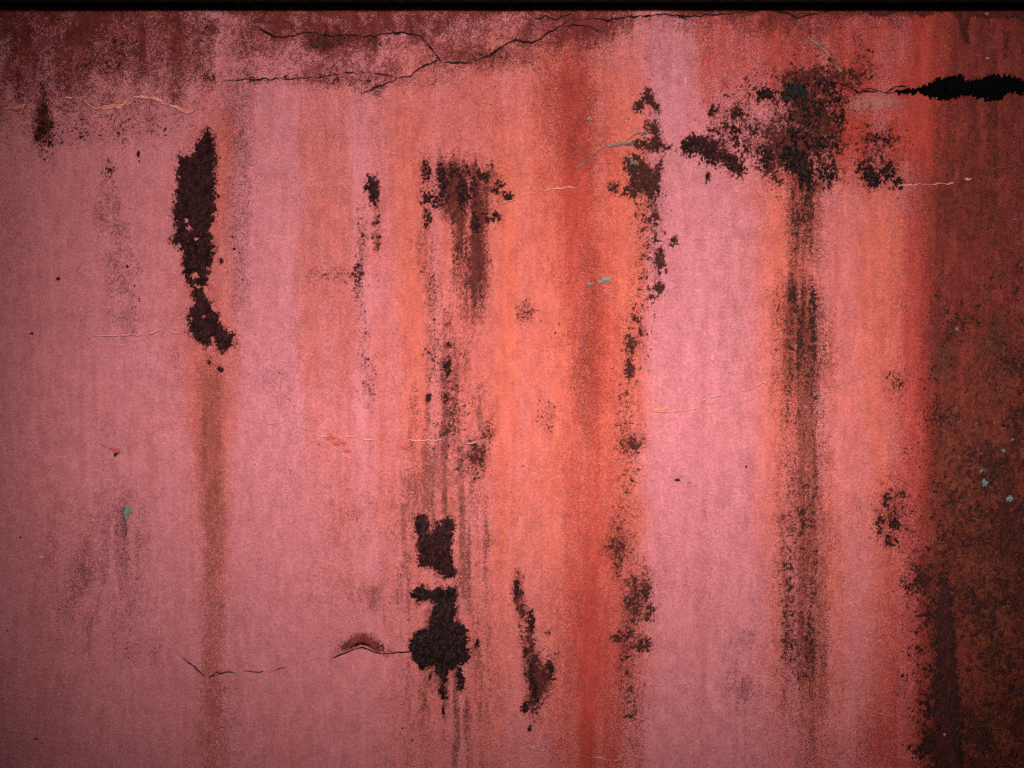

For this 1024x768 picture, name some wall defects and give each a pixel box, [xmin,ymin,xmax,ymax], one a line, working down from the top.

rust [164,66,254,768]
rust [281,8,660,768]
crack [225,5,912,94]
rust [687,7,1024,768]
spalling [895,73,1024,102]